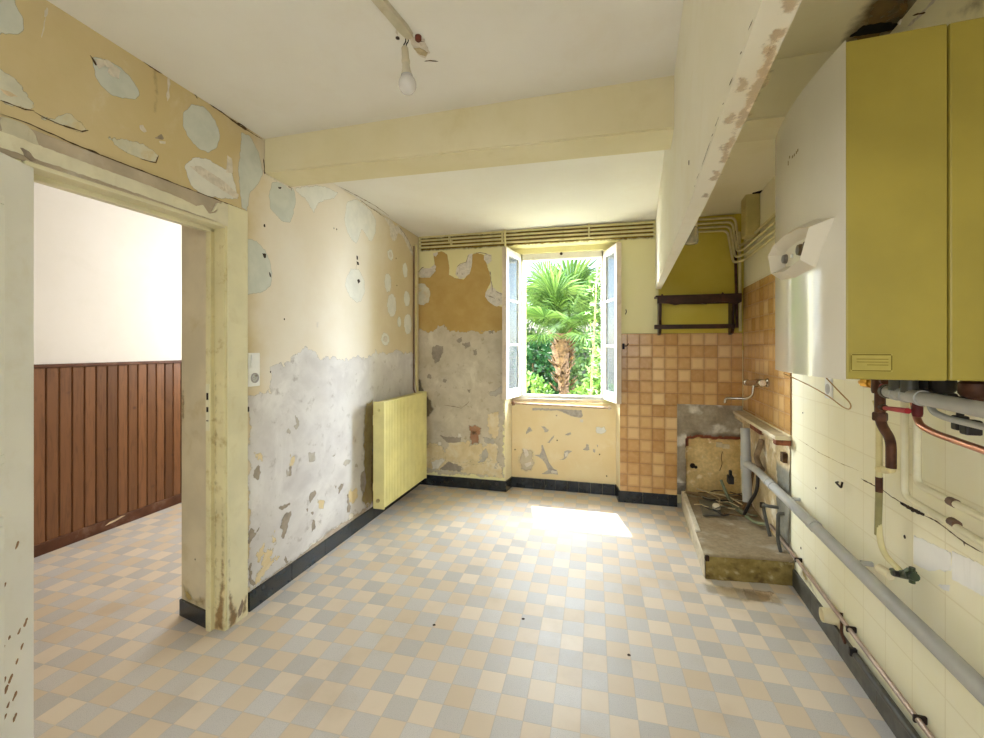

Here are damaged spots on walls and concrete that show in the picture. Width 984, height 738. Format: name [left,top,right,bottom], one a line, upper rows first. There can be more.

peeling [0,69,89,133]
peeling [0,117,239,226]
peeling [248,251,505,593]
peeling [532,408,583,423]
peeling [523,426,598,475]
spalling [677,404,792,554]
crack [800,440,981,552]